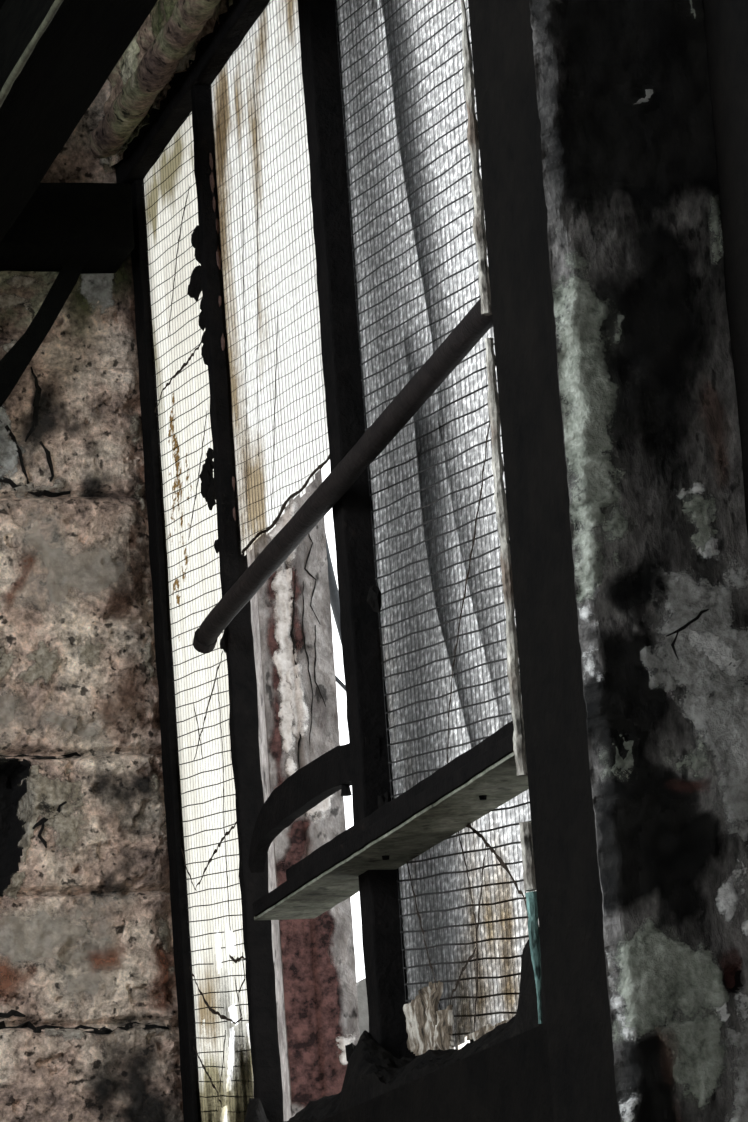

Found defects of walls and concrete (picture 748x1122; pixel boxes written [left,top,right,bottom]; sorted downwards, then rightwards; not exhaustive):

crack [0,367,71,498]
flaking render [552,253,628,621]
crack [666,609,709,660]
spalling [582,650,600,680]
flaking render [640,483,748,841]
crack [0,752,81,778]
flaking render [599,734,634,781]
crack [32,801,67,848]
crack [181,650,245,1106]
flaking render [715,863,748,936]
crack [0,1009,169,1035]